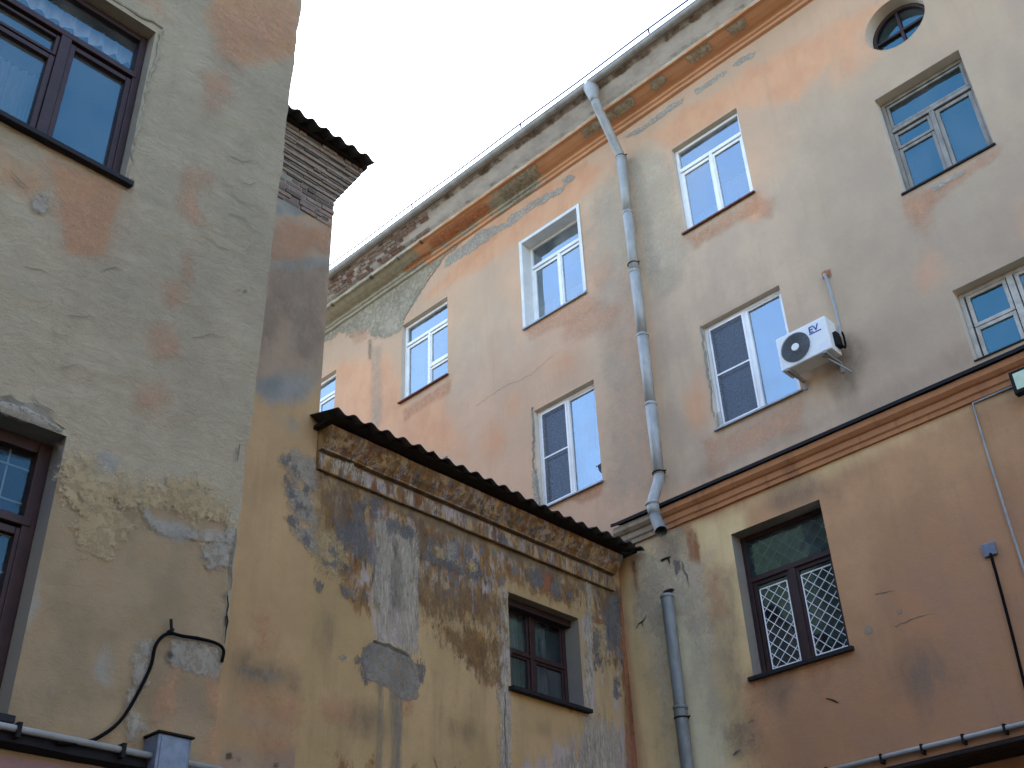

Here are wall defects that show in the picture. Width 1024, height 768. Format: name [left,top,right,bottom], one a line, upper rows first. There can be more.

peeling [685,42,712,63]
flaking render [695,52,755,94]
peeling [581,96,635,137]
flaking render [324,164,574,341]
peeling [54,449,234,569]
peeling [280,449,484,602]
crack [224,528,237,643]
peeling [166,636,221,679]
flaking render [340,640,426,701]
peeling [592,592,622,671]